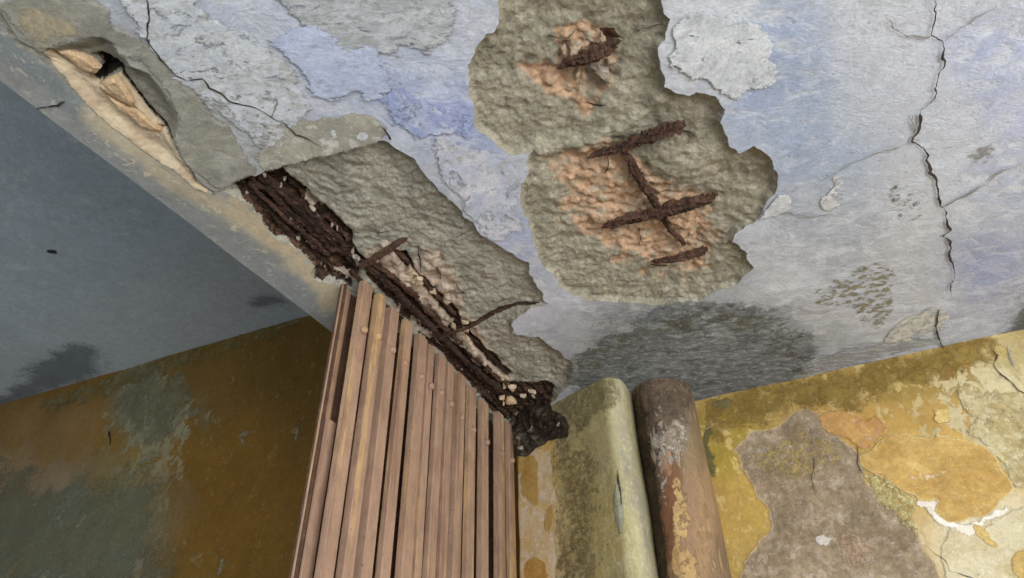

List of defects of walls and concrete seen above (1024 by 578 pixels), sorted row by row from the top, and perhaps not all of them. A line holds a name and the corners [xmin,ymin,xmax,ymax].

leakage [0,319,300,414]
crack [146,0,321,147]
spalling [0,0,792,578]
leakage [555,299,1024,578]
flaking render [734,385,1024,578]
crack [821,2,1024,347]